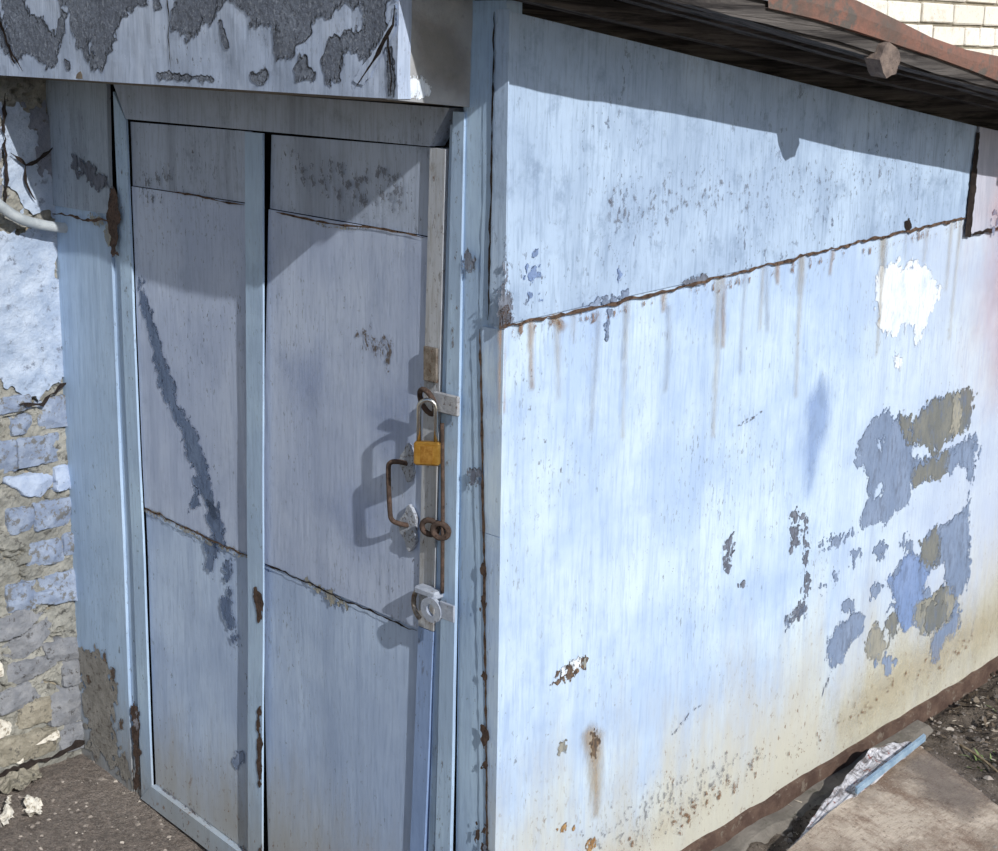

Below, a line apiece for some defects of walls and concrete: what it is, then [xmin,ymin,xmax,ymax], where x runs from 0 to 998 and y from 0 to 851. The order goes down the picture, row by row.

peeling [0,0,398,98]
peeling [0,99,56,219]
crack [1,93,110,228]
peeling [0,228,64,401]
corrosion [103,186,124,257]
corrosion [497,217,965,335]
peeling [137,276,242,647]
peeling [783,386,982,697]
corrosion [253,587,264,623]
peeling [78,643,133,788]
corrosion [130,693,142,794]
corrosion [586,728,601,794]